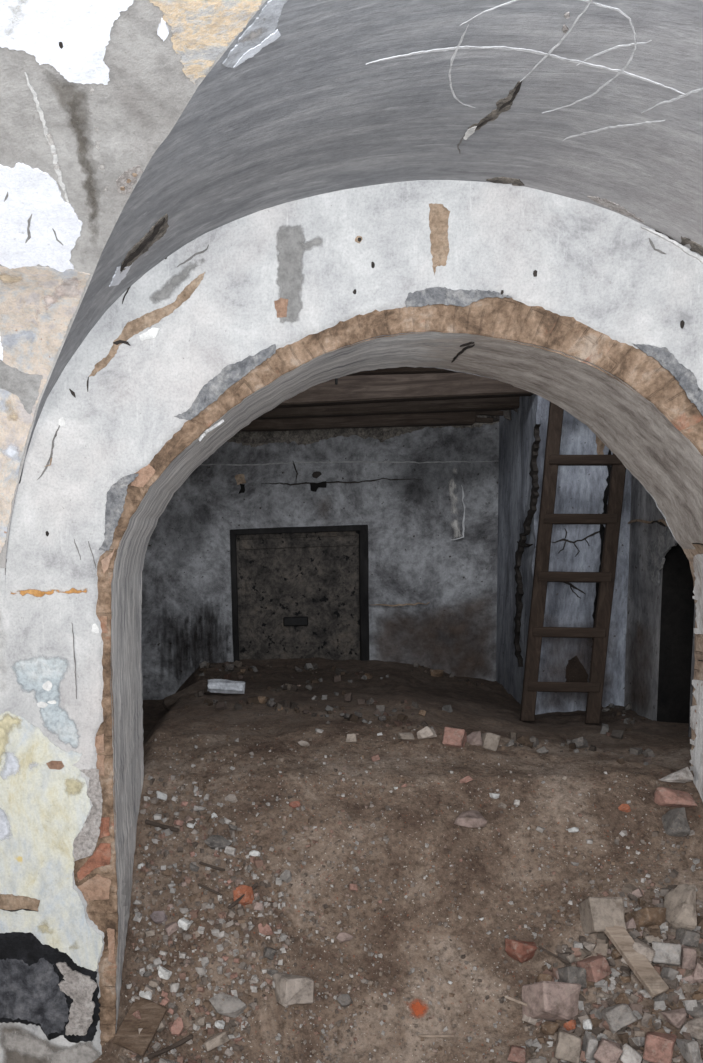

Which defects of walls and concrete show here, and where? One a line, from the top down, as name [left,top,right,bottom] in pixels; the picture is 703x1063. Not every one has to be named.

peeling [0,0,134,85]
peeling [149,0,288,84]
crack [457,0,592,153]
crack [451,342,475,363]
crack [261,461,422,492]
crack [514,424,668,667]
crack [692,543,703,553]
rust [11,588,87,597]
flaking render [0,203,703,1046]